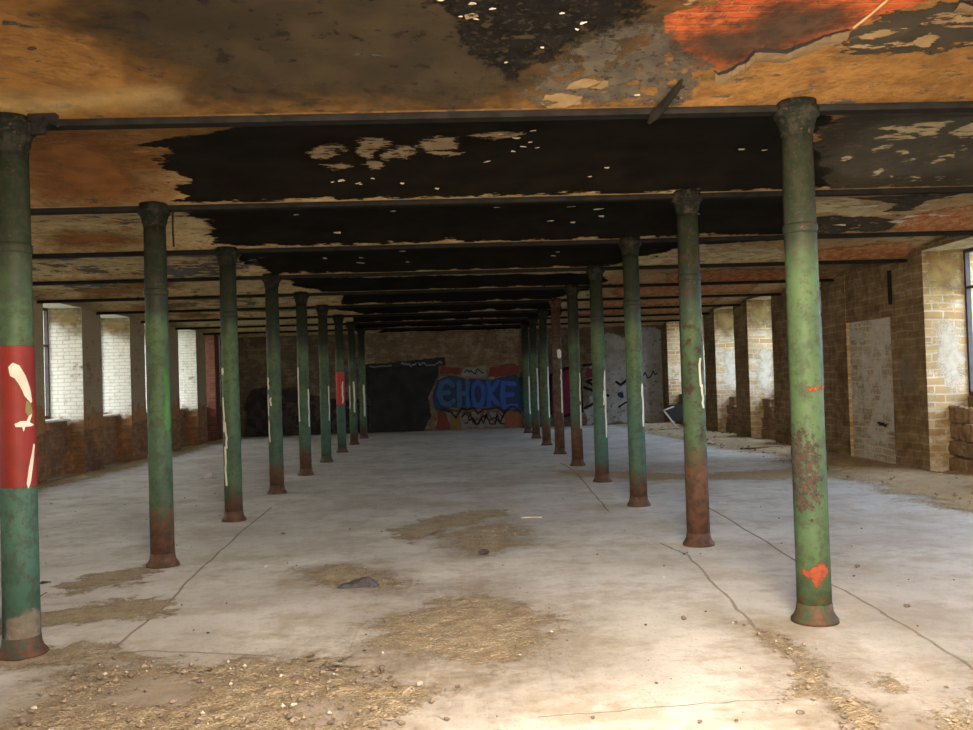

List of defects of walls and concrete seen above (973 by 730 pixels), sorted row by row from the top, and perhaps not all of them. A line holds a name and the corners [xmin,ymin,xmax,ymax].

peeling [540,78,609,109]
damp [522,21,714,108]
flaking render [663,0,973,87]
peeling [307,130,540,185]
peeling [813,112,973,260]
crack [709,508,795,561]
crack [114,507,273,656]
crack [660,543,858,727]
crack [832,585,973,670]